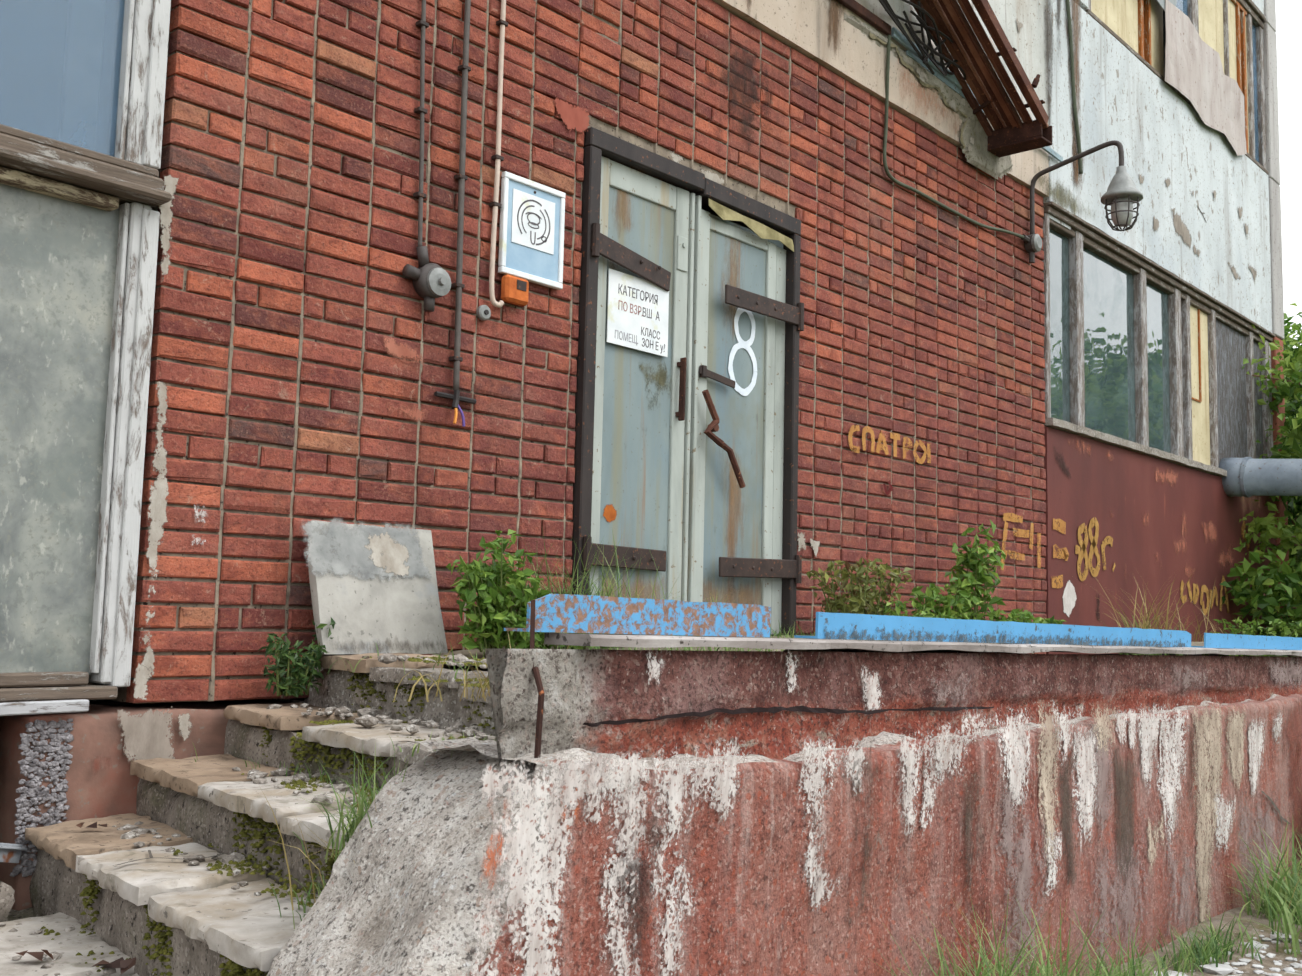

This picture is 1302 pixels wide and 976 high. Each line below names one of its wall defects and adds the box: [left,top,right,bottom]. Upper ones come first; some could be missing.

spalling [844,13,1013,179]
peeling [117,382,175,761]
crack [582,706,994,727]
leakage [1266,656,1302,689]
leakage [471,737,748,976]
leakage [799,740,871,909]
leakage [898,664,1302,976]